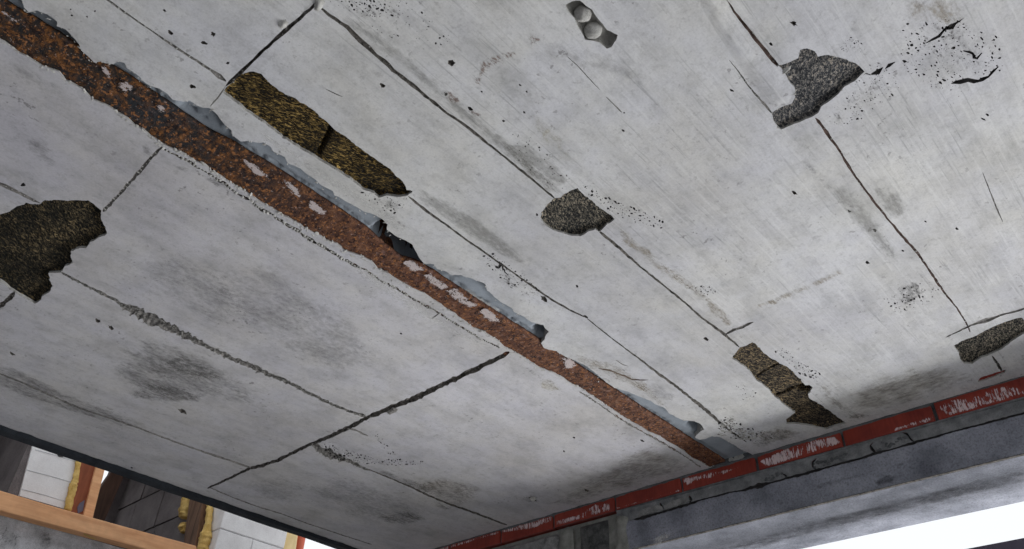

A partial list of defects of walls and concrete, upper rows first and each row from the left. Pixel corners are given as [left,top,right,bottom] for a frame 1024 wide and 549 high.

crack [729,60,771,113]
spalling [771,48,864,129]
crack [864,62,895,76]
crack [925,18,998,84]
crack [154,142,501,349]
spalling [0,0,747,468]
crack [60,271,368,436]
crack [599,360,644,381]
crack [725,322,753,334]
spalling [732,342,846,429]
spalling [954,318,1024,364]
crack [311,443,369,471]